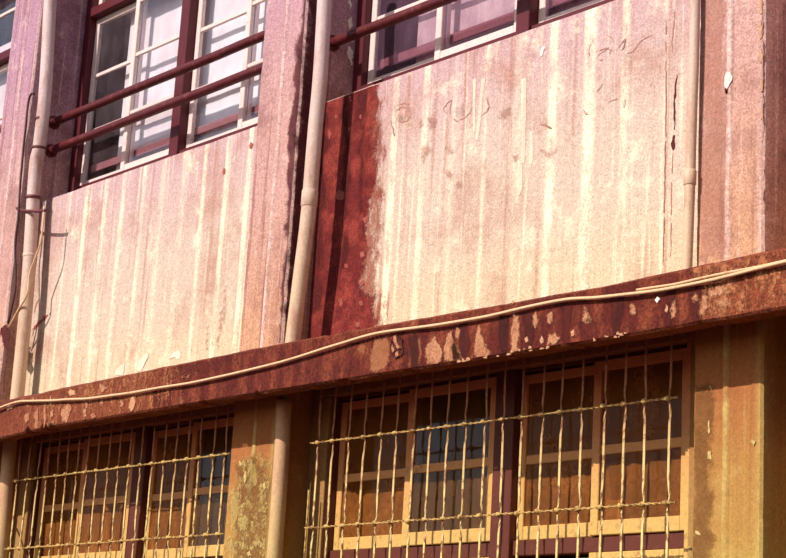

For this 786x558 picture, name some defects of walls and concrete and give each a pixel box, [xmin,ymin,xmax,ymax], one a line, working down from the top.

peeling [724,72,733,94]
crack [588,12,677,264]
damp [148,0,710,408]
spalling [0,325,10,351]
peeling [409,312,560,365]
peeling [227,458,270,558]